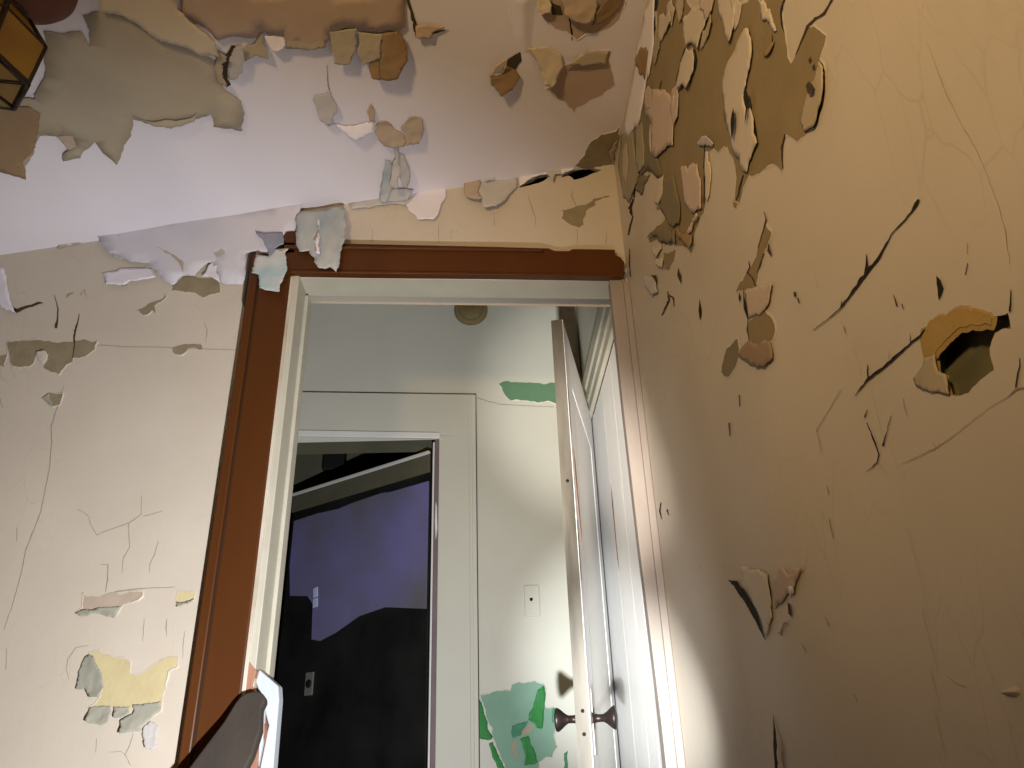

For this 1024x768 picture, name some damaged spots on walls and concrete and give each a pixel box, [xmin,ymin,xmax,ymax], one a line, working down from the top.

peeling [464,0,832,295]
peeling [0,0,446,697]
peeling [498,380,556,404]
peeling [721,213,777,380]
crack [813,199,919,331]
crack [816,329,1024,474]
spalling [913,290,1011,396]
crack [77,496,162,589]
peeling [728,566,802,639]
peeling [75,649,180,750]
peeling [478,680,568,768]